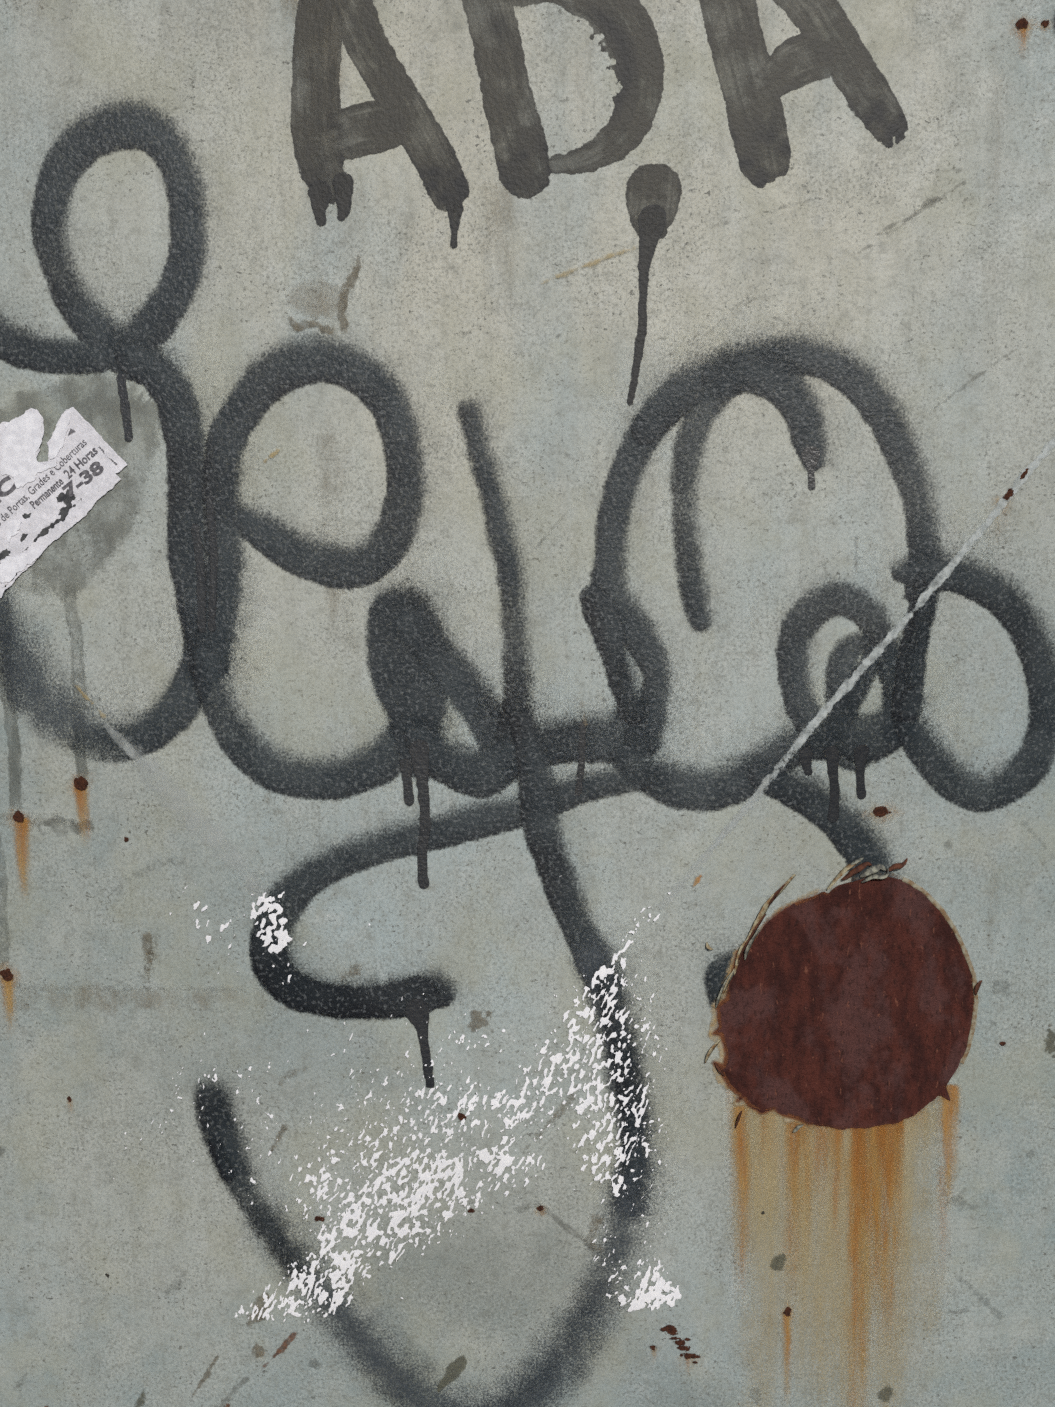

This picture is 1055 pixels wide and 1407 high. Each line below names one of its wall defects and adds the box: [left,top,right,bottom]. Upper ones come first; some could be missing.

corrosion [74,776,88,825]
corrosion [12,810,28,885]
corrosion [0,968,13,1012]
corrosion [705,857,982,1405]